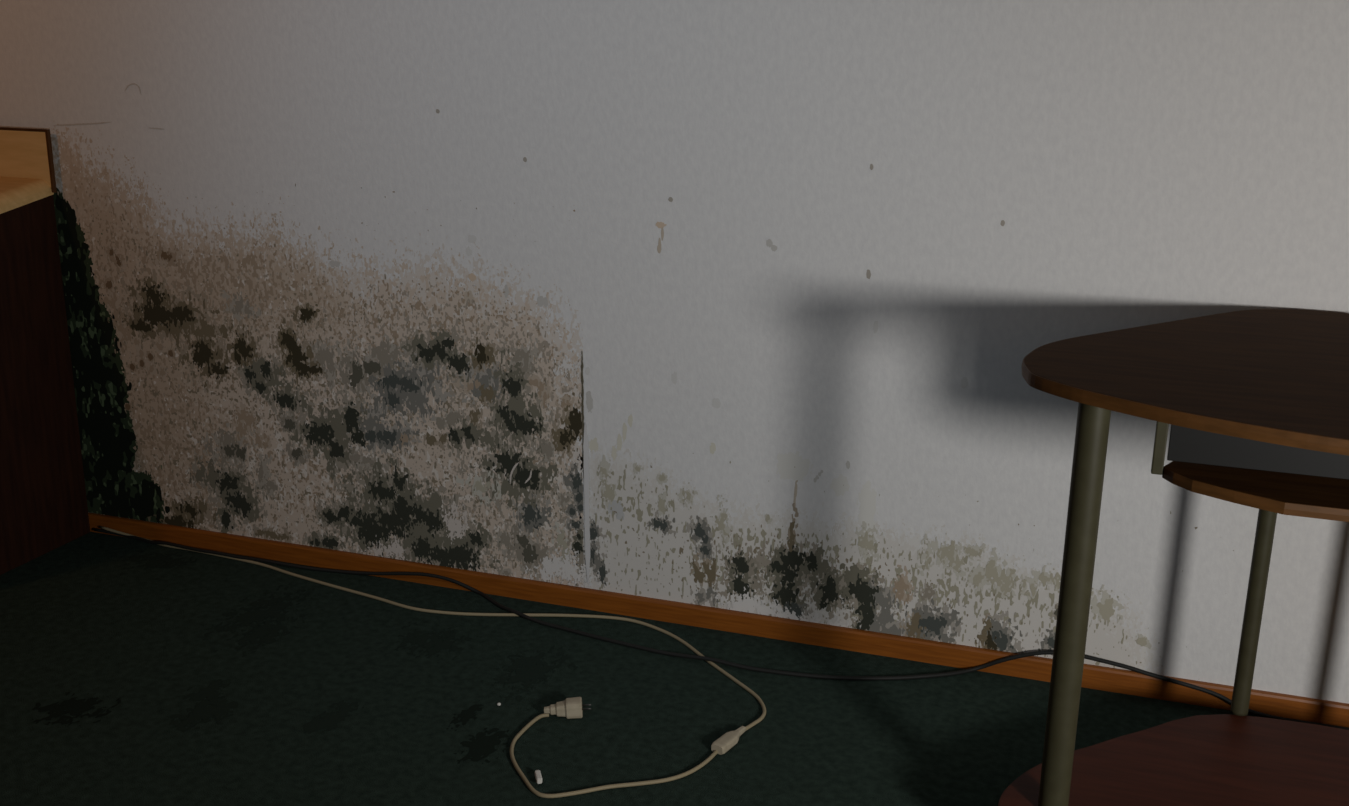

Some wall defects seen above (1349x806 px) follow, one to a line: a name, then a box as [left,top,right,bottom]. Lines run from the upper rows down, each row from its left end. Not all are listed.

water stain [38,121,1063,658]
water stain [1084,584,1171,675]